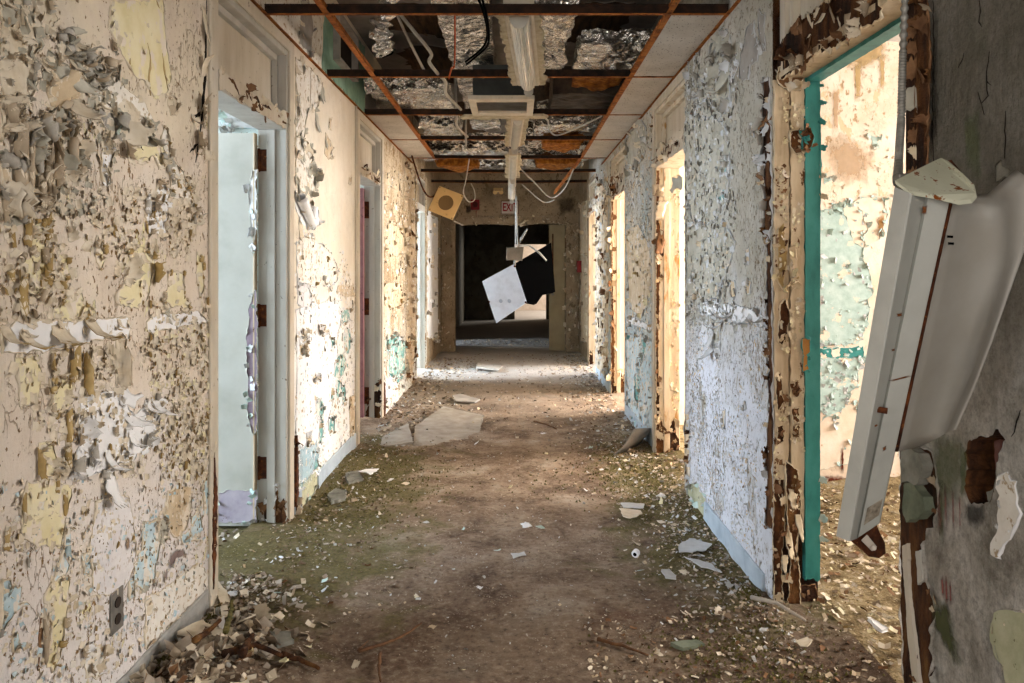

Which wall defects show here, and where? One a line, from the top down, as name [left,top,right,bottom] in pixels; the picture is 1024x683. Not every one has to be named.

crack [190,0,216,162]
peeling [0,0,289,683]
peeling [218,0,895,604]
spalling [898,445,941,683]
spalling [964,429,1023,560]
peeling [990,609,1024,683]